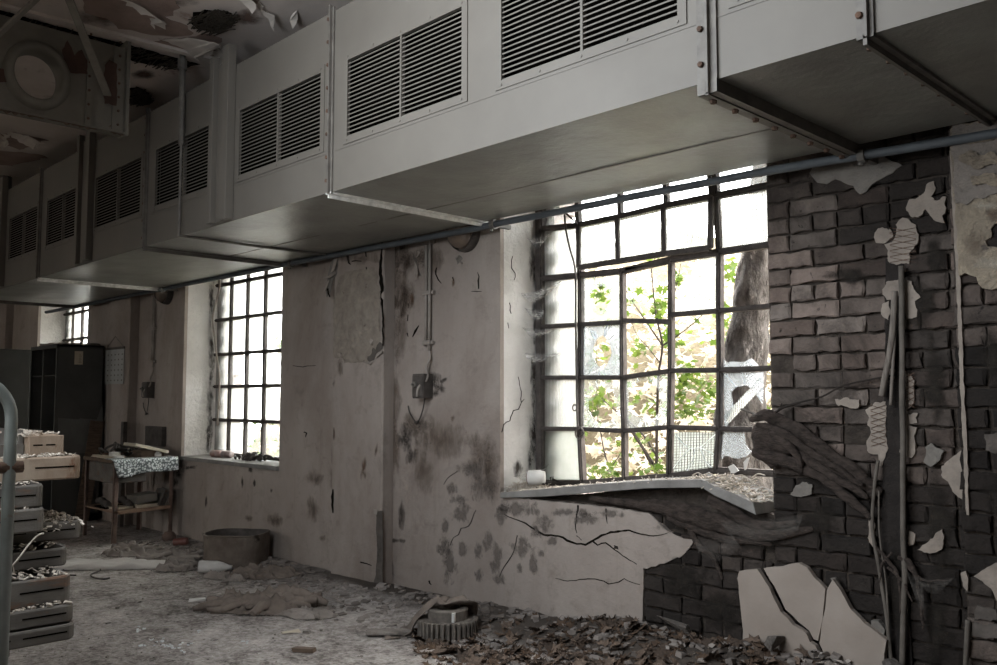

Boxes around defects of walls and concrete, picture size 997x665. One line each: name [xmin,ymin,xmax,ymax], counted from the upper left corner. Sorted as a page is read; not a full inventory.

peeling [83,0,223,65]
peeling [240,0,275,31]
flaking render [986,224,997,247]
damp [393,385,452,475]
crack [502,377,523,431]
damp [515,412,536,475]
flaking render [984,433,997,454]
damp [438,484,623,583]
crack [500,505,669,585]
flaking render [971,605,997,639]